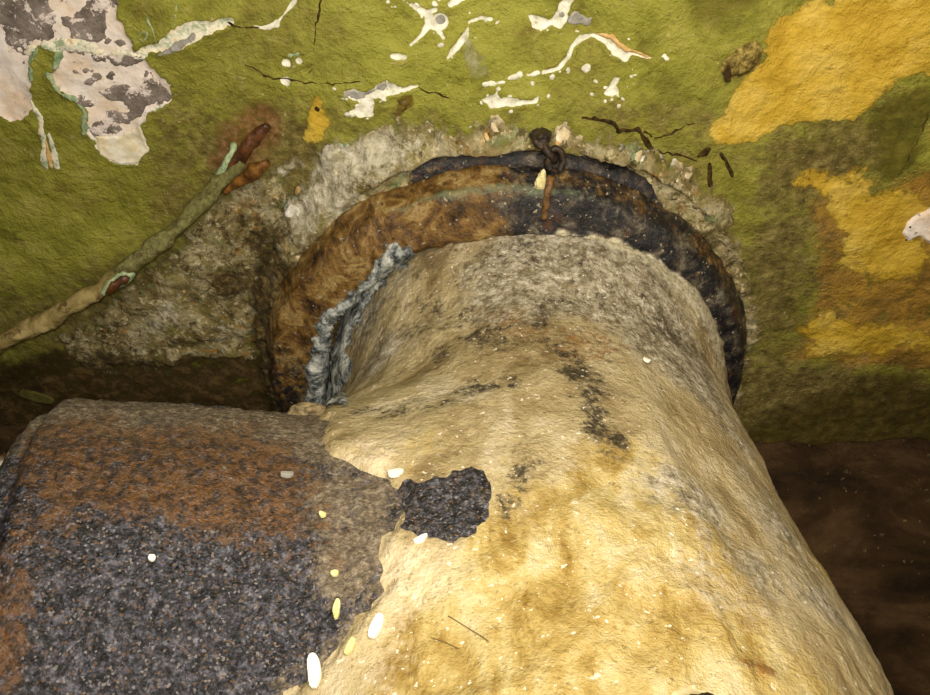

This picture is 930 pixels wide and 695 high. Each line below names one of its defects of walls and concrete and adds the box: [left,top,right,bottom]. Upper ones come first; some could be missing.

peeling [0,0,172,170]
crack [136,0,297,57]
peeling [280,52,303,86]
crack [245,0,361,86]
peeling [332,80,418,120]
crack [393,86,459,114]
peeling [386,0,500,66]
peeling [480,0,669,113]
rust [211,106,280,169]
crack [581,116,734,187]
spalling [902,207,930,243]
peeling [387,466,492,544]